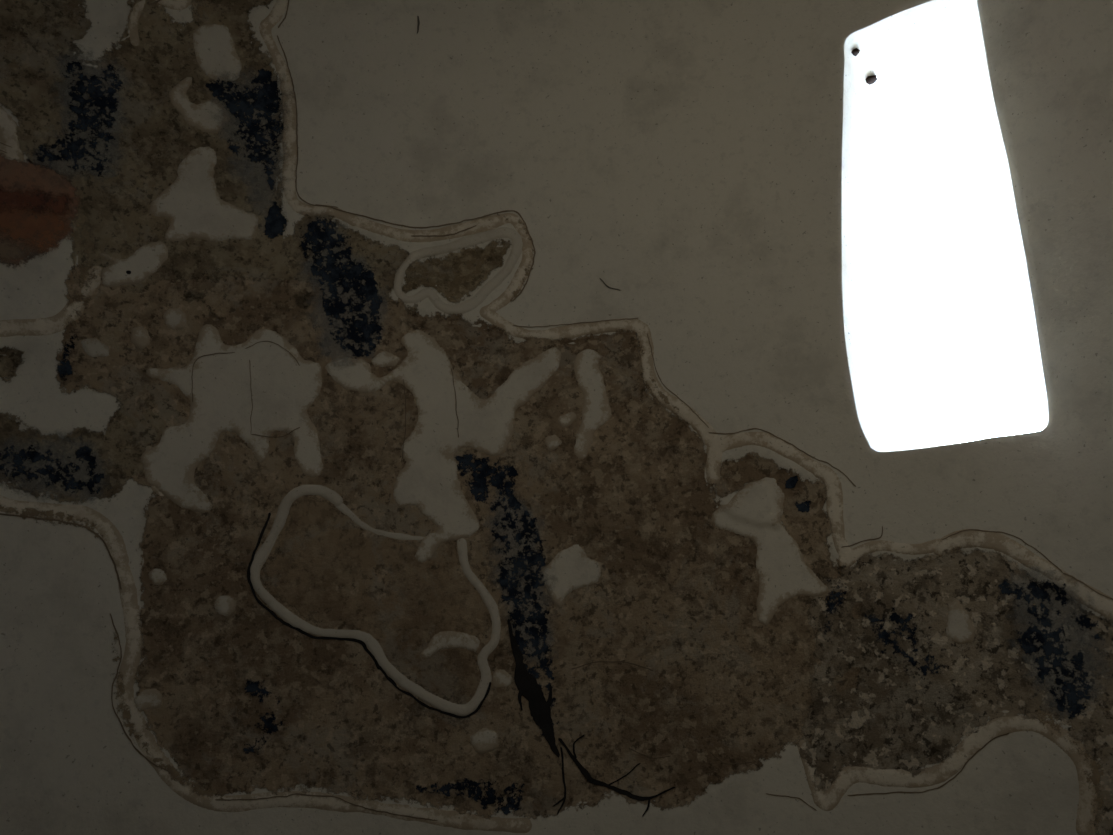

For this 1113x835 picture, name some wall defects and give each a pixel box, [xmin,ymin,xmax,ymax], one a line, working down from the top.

damp [36,56,123,177]
damp [206,69,287,239]
flaking render [0,0,533,312]
damp [299,217,384,358]
damp [0,505,99,538]
damp [0,445,104,494]
crack [110,614,174,774]
crack [247,513,675,817]
damp [456,454,557,709]
flaking render [0,220,1113,835]
damp [998,579,1100,734]
crack [215,793,437,821]